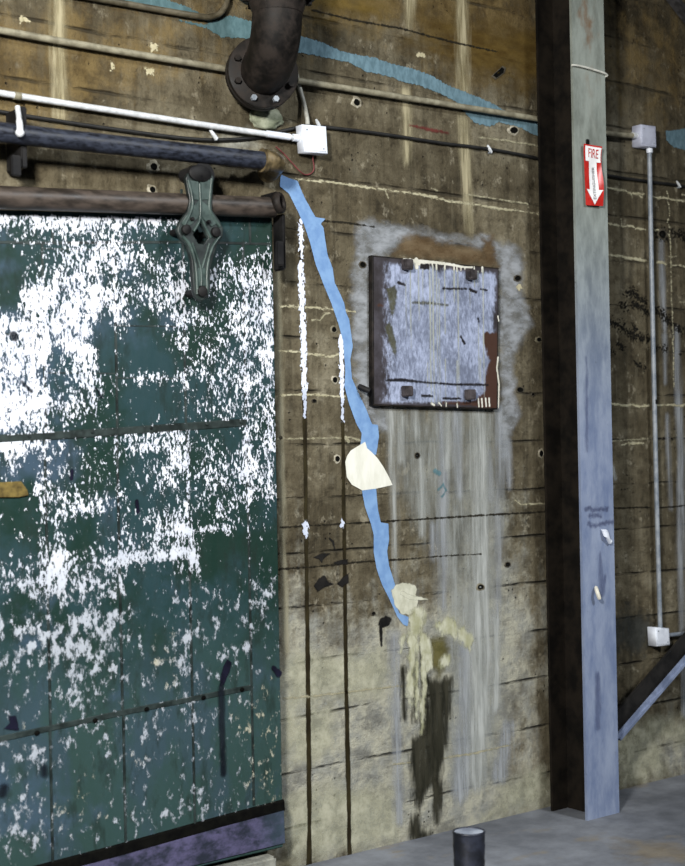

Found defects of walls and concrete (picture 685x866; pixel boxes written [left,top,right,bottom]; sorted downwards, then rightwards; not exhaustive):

corrosion [399,235,496,265]
peeling [0,214,277,748]
damp [394,409,499,839]
peeling [14,745,45,770]
peeling [3,786,45,850]